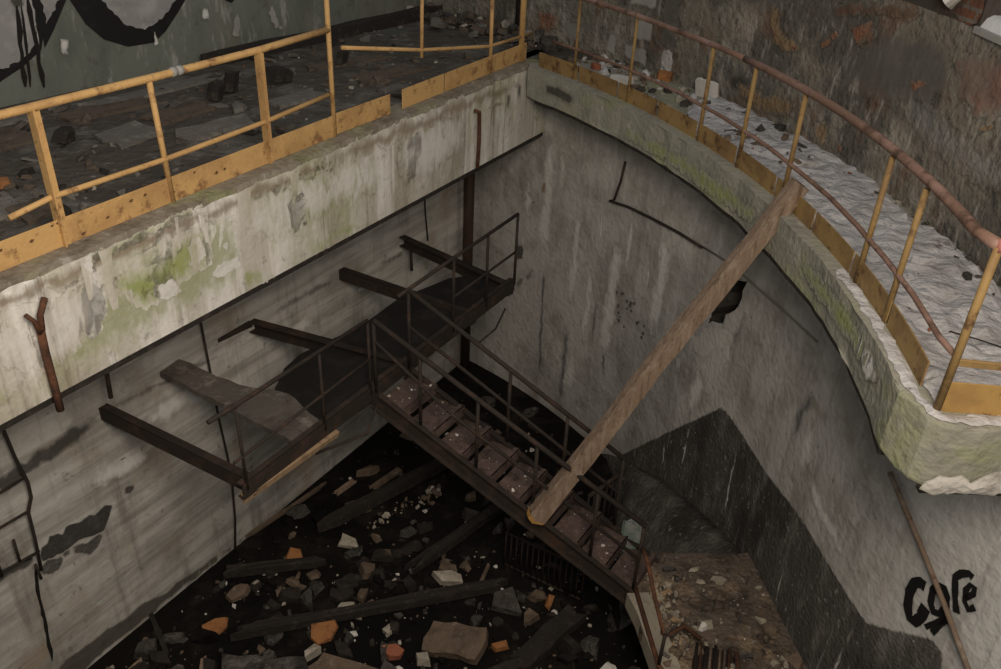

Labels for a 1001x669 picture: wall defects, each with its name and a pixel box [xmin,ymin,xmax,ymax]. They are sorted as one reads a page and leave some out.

damp [0,73,528,374]
spalling [708,280,747,324]
rust [24,297,65,413]
damp [146,390,214,426]
damp [0,417,98,495]
damp [85,447,152,489]